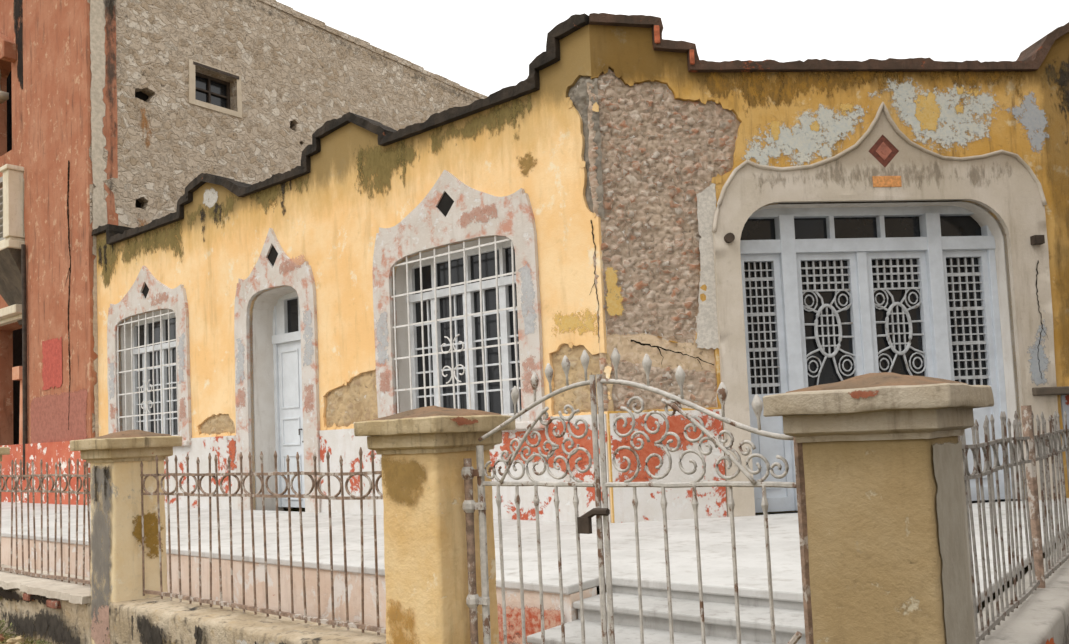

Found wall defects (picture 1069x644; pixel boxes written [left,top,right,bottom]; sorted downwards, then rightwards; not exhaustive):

peeling [868,78,1049,152]
damp [1046,61,1069,119]
peeling [460,203,498,228]
spalling [500,65,868,482]
crack [1036,260,1048,378]
spalling [197,338,246,476]
peeling [304,384,314,413]
spalling [325,312,390,430]
peeling [848,390,879,399]
peeling [1027,321,1049,386]
damp [131,615,175,644]
damp [194,625,203,644]